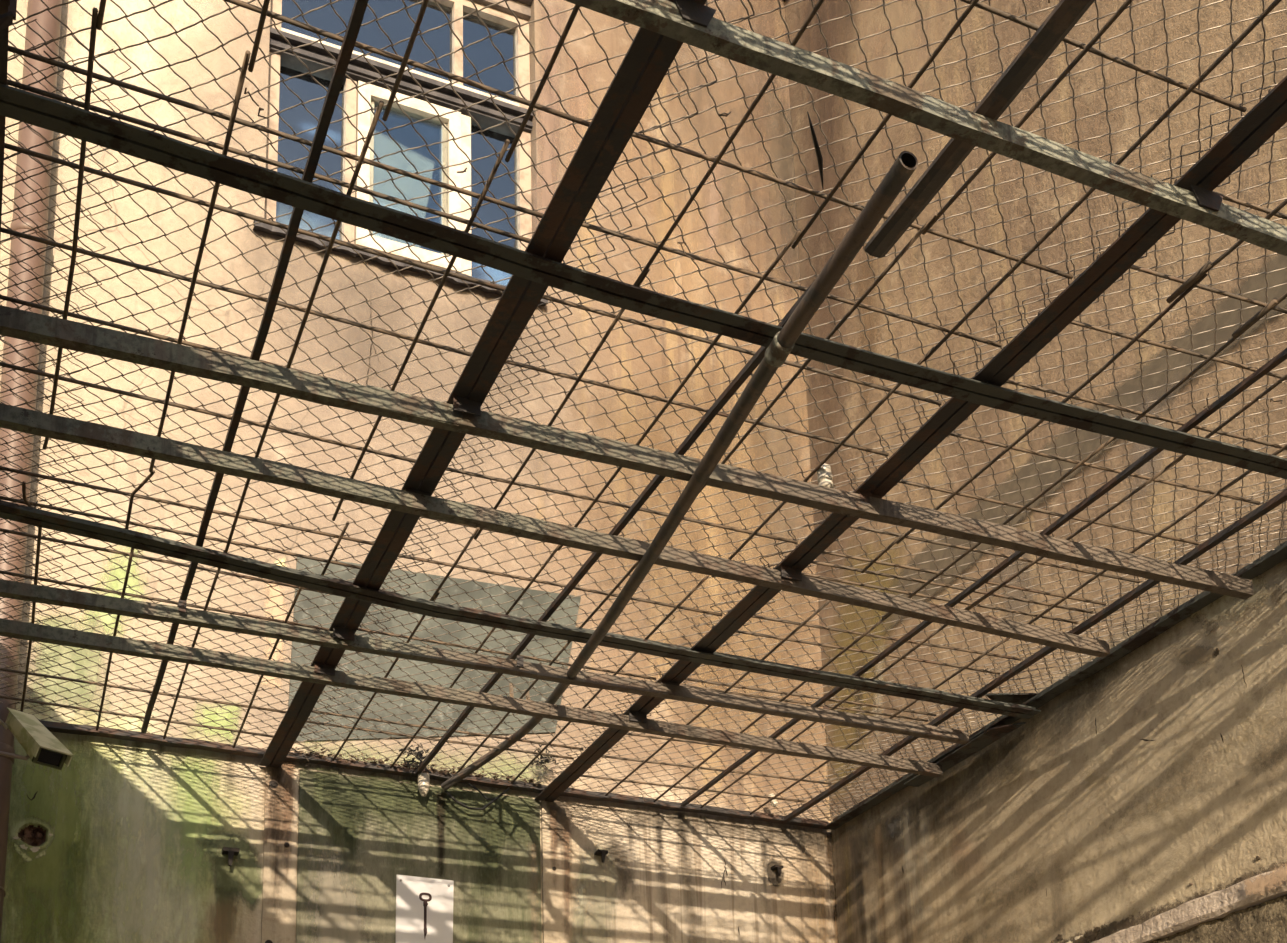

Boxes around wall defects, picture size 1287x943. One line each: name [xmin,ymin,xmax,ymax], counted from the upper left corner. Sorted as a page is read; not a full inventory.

leakage [752,662,1117,943]
spalling [7,810,54,855]
leakage [609,842,631,892]
leakage [215,889,237,942]